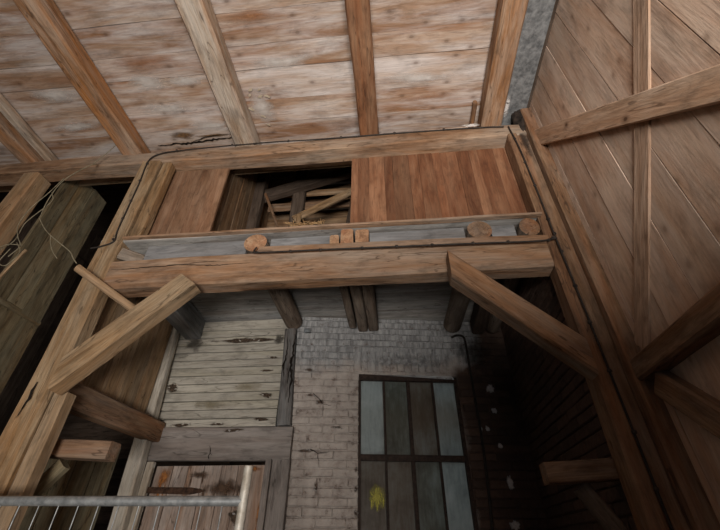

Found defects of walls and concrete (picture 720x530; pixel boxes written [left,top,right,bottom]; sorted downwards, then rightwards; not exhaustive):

crack [158,134,231,146]
crack [282,336,296,402]
crack [17,382,37,416]